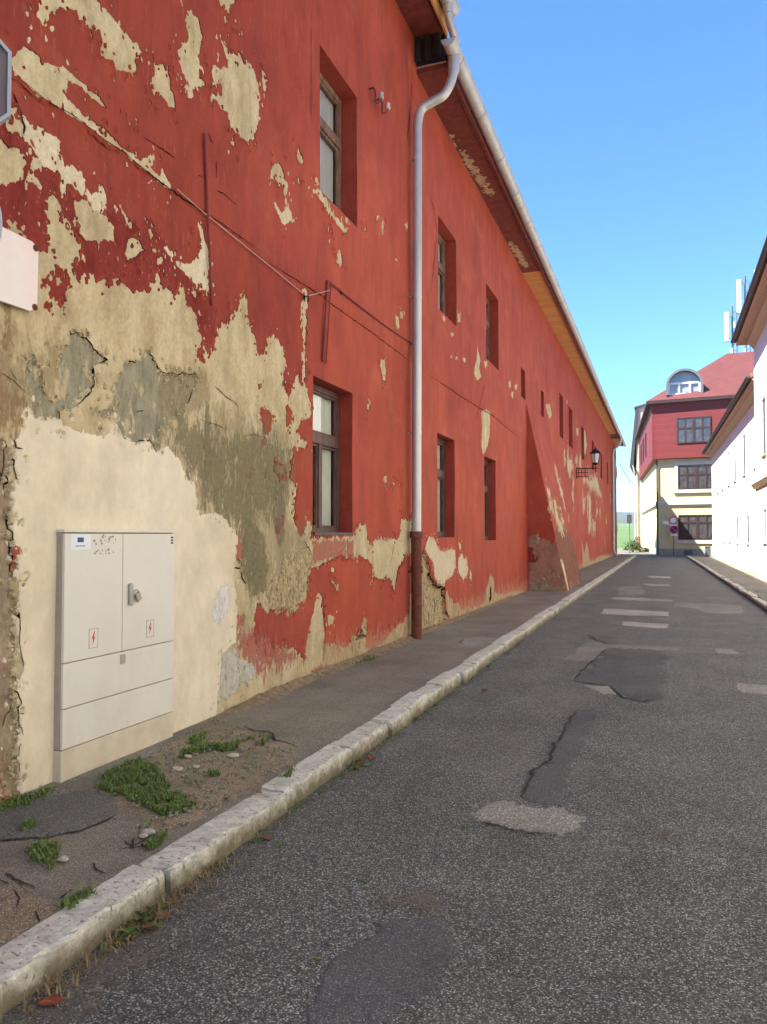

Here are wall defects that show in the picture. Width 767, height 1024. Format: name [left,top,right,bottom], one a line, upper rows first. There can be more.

crack [13,75,521,440]
peeling [0,0,412,800]
crack [0,438,22,574]
flaking render [425,428,620,620]
crack [3,610,24,773]